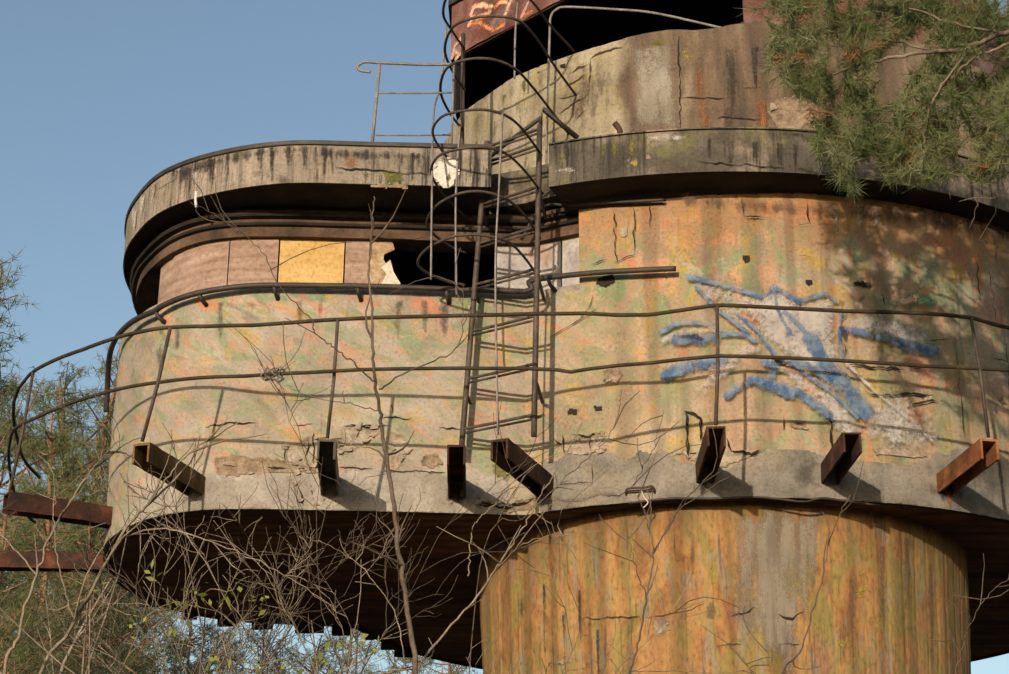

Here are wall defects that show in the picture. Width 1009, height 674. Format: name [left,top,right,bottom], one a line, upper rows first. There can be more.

crack [559,47,621,118]
damp [635,49,679,140]
spalling [767,95,820,130]
damp [173,146,274,184]
damp [287,147,430,178]
spalling [214,432,325,505]
spalling [336,421,442,469]
spalling [554,430,607,455]
spalling [719,449,758,467]